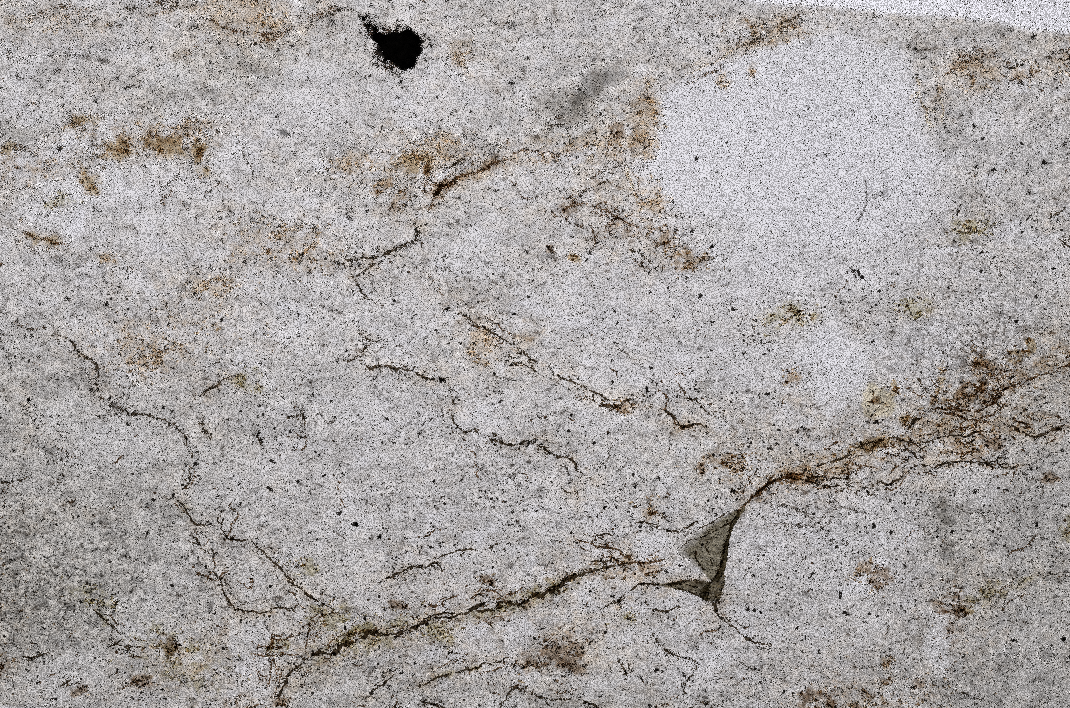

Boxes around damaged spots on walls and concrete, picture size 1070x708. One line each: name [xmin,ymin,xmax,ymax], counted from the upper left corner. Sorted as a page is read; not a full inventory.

rust [25,107,223,209]
crack [330,115,575,305]
rust [524,82,669,162]
crack [560,160,656,271]
rust [544,179,714,279]
crack [57,331,723,708]
crack [442,306,725,433]
rust [694,451,761,486]
rust [754,301,822,337]
crack [730,347,1070,529]
rust [759,335,1070,490]
crack [719,613,775,655]